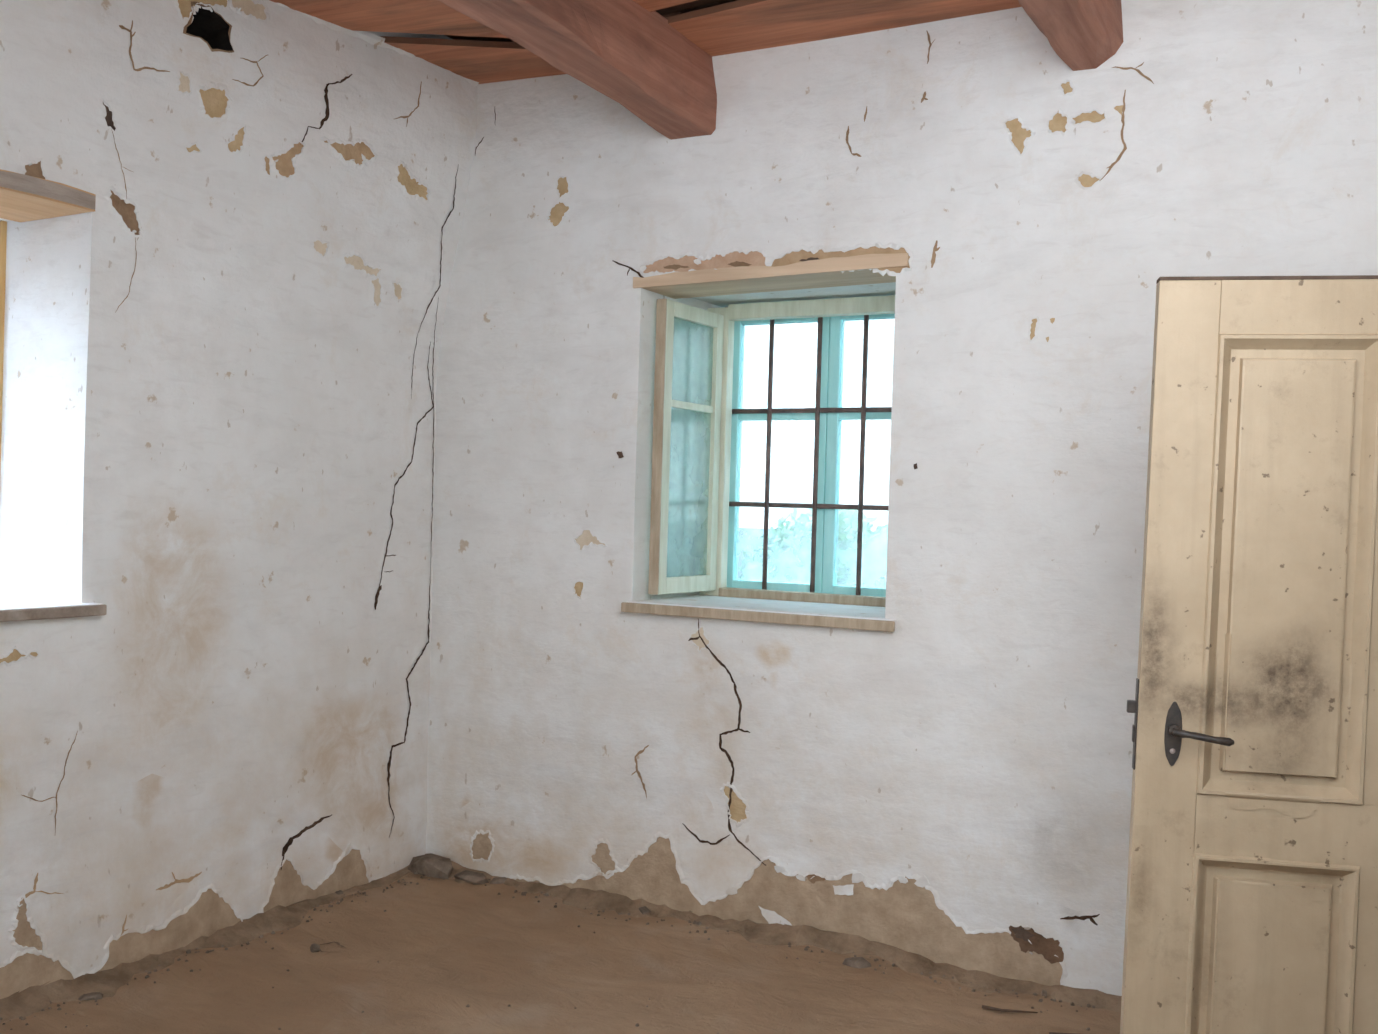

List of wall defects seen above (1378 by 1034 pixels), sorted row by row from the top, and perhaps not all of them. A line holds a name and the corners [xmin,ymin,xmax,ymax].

spalling [174,0,270,53]
crack [302,74,353,142]
flaking render [1003,79,1123,157]
crack [1099,62,1154,181]
flaking render [639,242,914,277]
crack [374,110,496,837]
leakage [94,472,252,841]
leakage [0,708,49,849]
crack [682,619,766,866]
crack [281,815,332,870]
flaking render [0,884,243,999]
flaking render [509,831,1068,986]